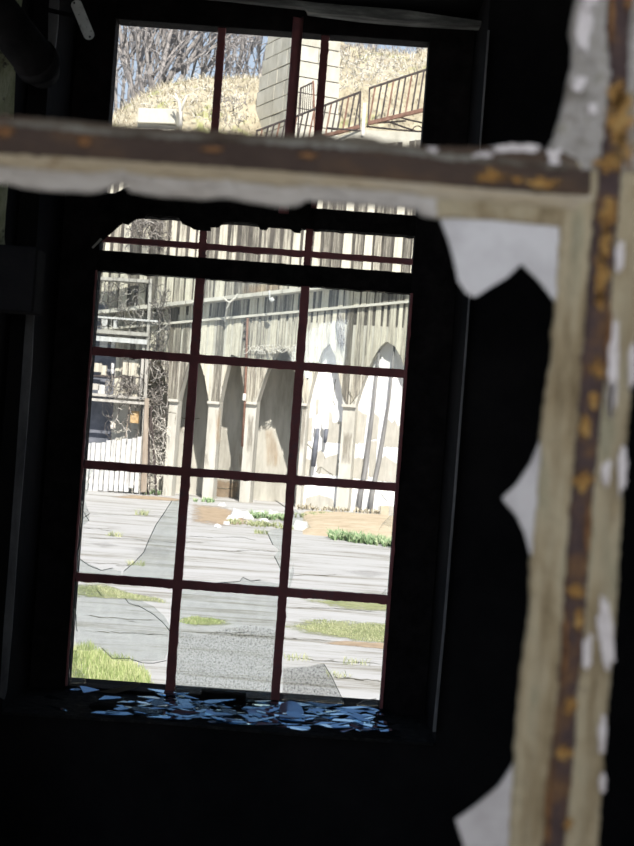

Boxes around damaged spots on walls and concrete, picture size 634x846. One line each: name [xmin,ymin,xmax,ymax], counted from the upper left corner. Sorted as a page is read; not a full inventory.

peeling [576,0,599,55]
corrosion [609,0,633,44]
peeling [571,76,587,93]
corrosion [475,167,561,189]
corrosion [589,195,617,381]
corrosion [578,391,599,438]
crack [80,501,175,596]
corrosion [584,501,593,562]
crack [74,598,380,704]
corrosion [562,582,585,685]